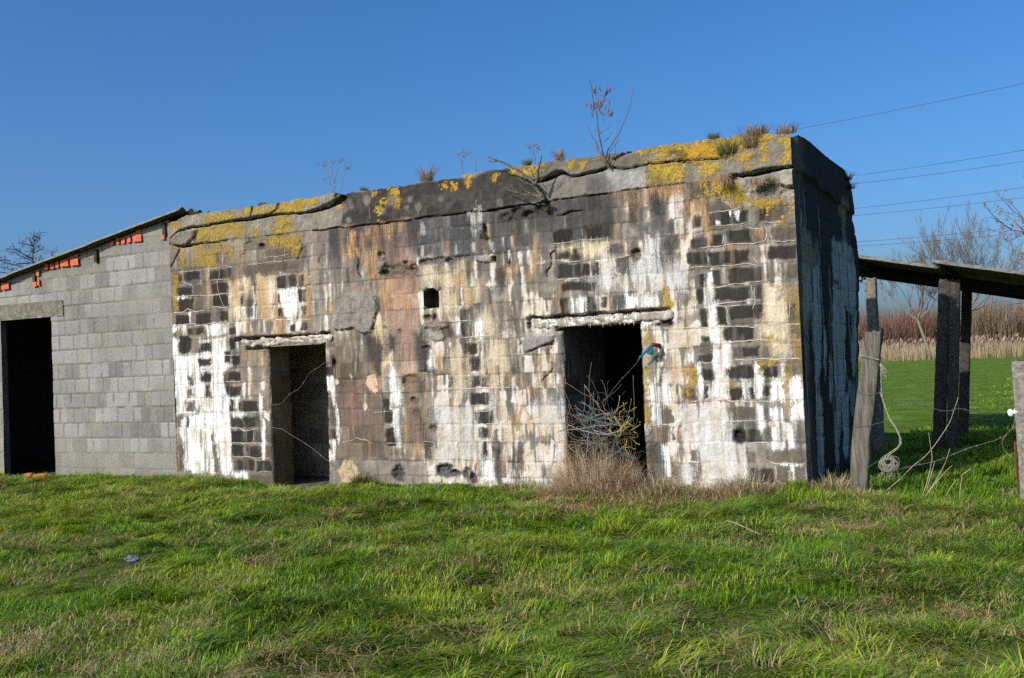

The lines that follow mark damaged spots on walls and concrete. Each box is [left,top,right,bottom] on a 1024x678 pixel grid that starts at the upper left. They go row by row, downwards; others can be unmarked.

water stain [693,234,705,250]
crack [169,159,800,364]
water stain [644,237,857,485]
water stain [172,272,301,480]
peeling [337,459,359,483]
spalling [391,464,404,481]
spalling [436,463,477,483]